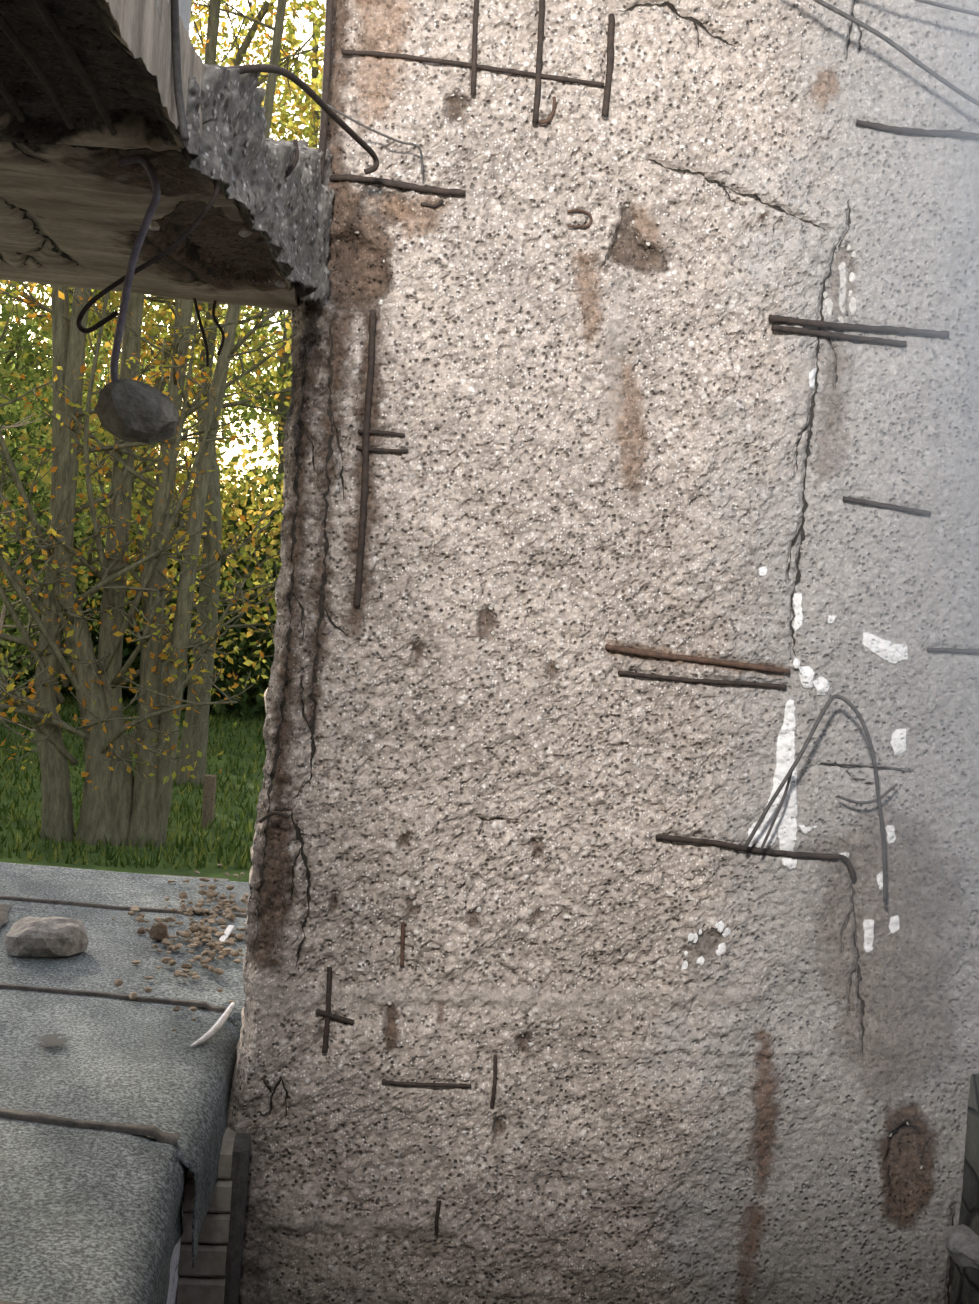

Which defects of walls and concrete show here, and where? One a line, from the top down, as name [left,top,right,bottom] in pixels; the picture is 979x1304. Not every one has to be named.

corrosion [358,0,405,113]
crack [619,1,736,48]
spalling [149,200,286,288]
corrosion [613,368,644,488]
crack [649,159,851,667]
crack [253,325,347,967]
crack [821,764,907,785]
spalling [655,834,857,882]
crack [841,881,865,1054]
corrosion [753,1030,777,1183]